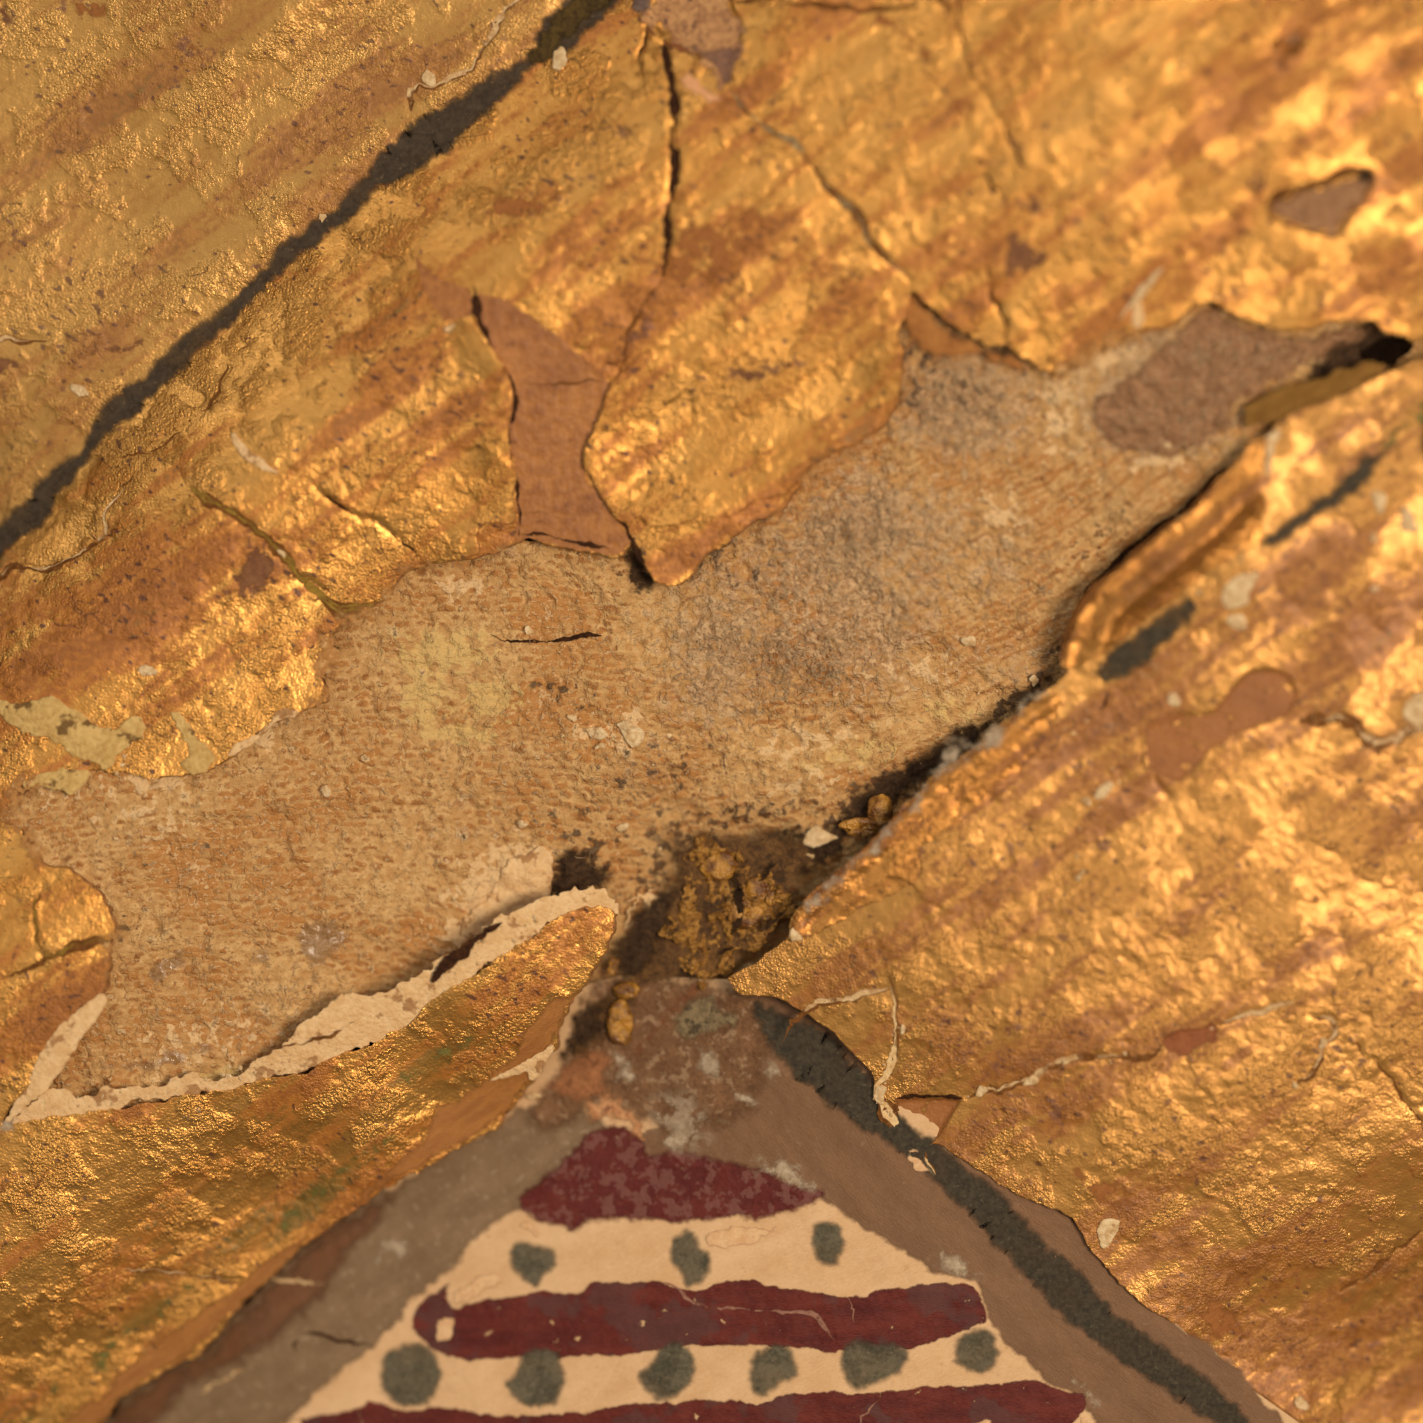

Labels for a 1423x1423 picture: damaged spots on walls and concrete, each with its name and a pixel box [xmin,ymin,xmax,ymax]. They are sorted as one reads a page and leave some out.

crack [619,27,681,374]
crack [729,89,909,279]
spalling [1254,162,1373,238]
crack [0,313,283,581]
crack [190,486,375,619]
crack [490,631,602,643]
peeling [0,256,1423,1141]
damp [978,727,1003,750]
crack [1298,711,1423,755]
damp [805,877,838,912]
damp [869,829,891,855]
crack [782,977,899,1127]